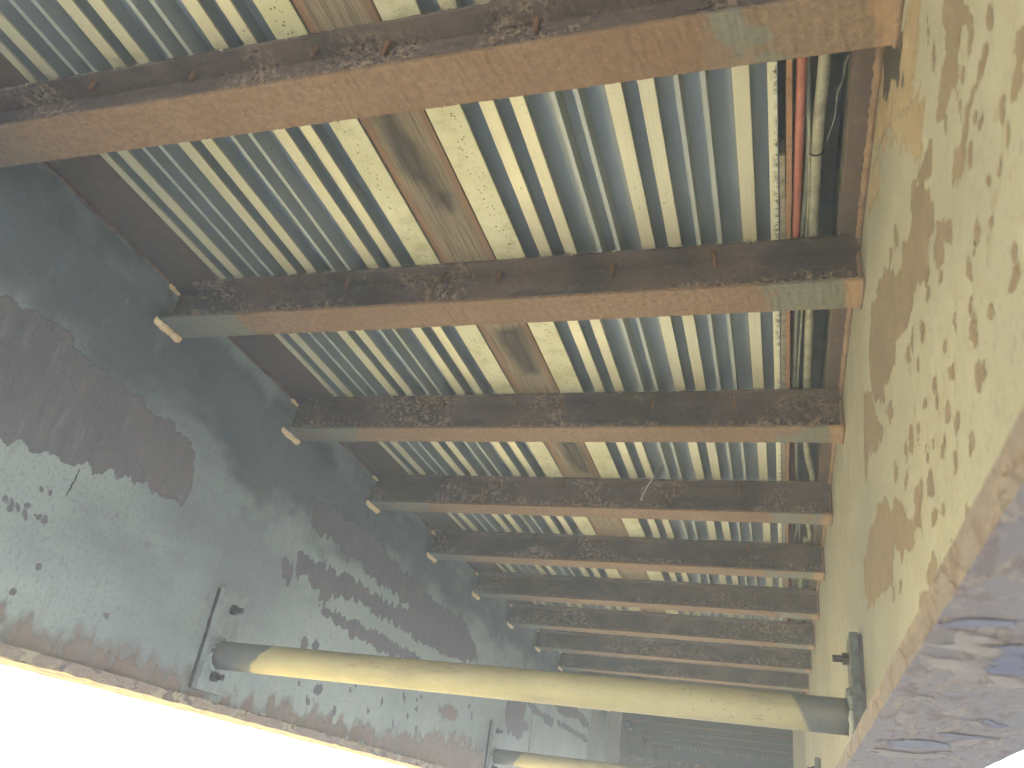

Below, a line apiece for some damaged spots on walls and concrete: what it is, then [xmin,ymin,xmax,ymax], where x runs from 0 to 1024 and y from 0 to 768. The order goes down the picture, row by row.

peeling [883,31,904,101]
peeling [936,0,989,188]
peeling [1010,26,1024,103]
peeling [864,138,952,483]
peeling [1008,262,1020,293]
peeling [864,469,937,609]